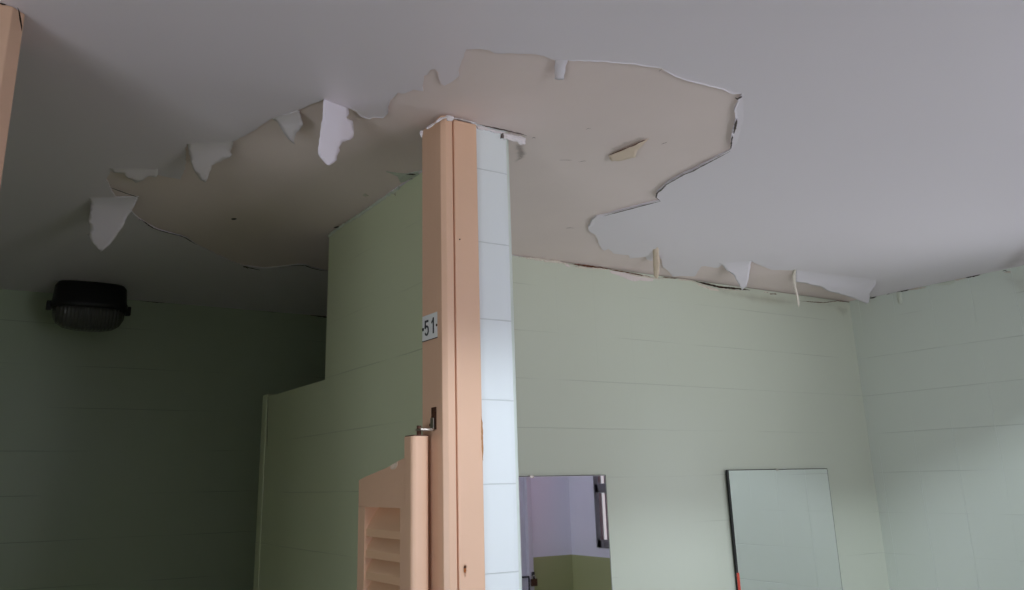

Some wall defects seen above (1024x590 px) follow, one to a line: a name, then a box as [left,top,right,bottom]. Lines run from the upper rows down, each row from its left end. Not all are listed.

peeling [88,49,876,307]